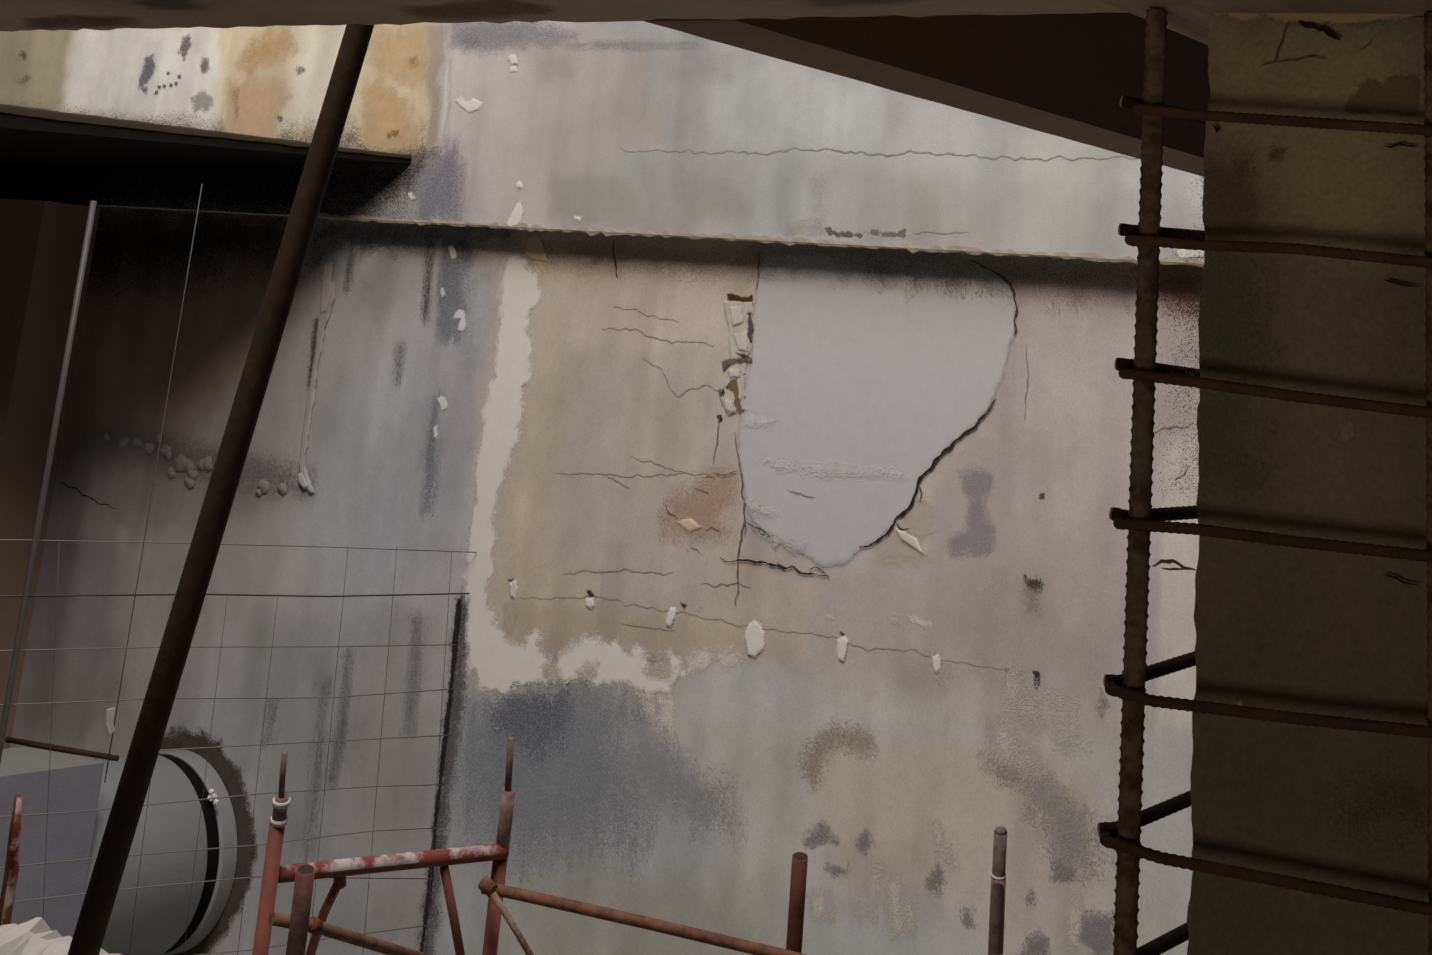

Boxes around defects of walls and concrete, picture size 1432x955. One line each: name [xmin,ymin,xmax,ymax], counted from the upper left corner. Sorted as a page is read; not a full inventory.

crack [1247,20,1372,68]
crack [621,147,1138,161]
spalling [718,293,754,417]
crack [517,231,1029,675]
peeling [895,528,926,555]
water stain [944,462,997,560]
water stain [430,675,749,909]
water stain [977,654,1118,955]
water stain [802,815,962,943]